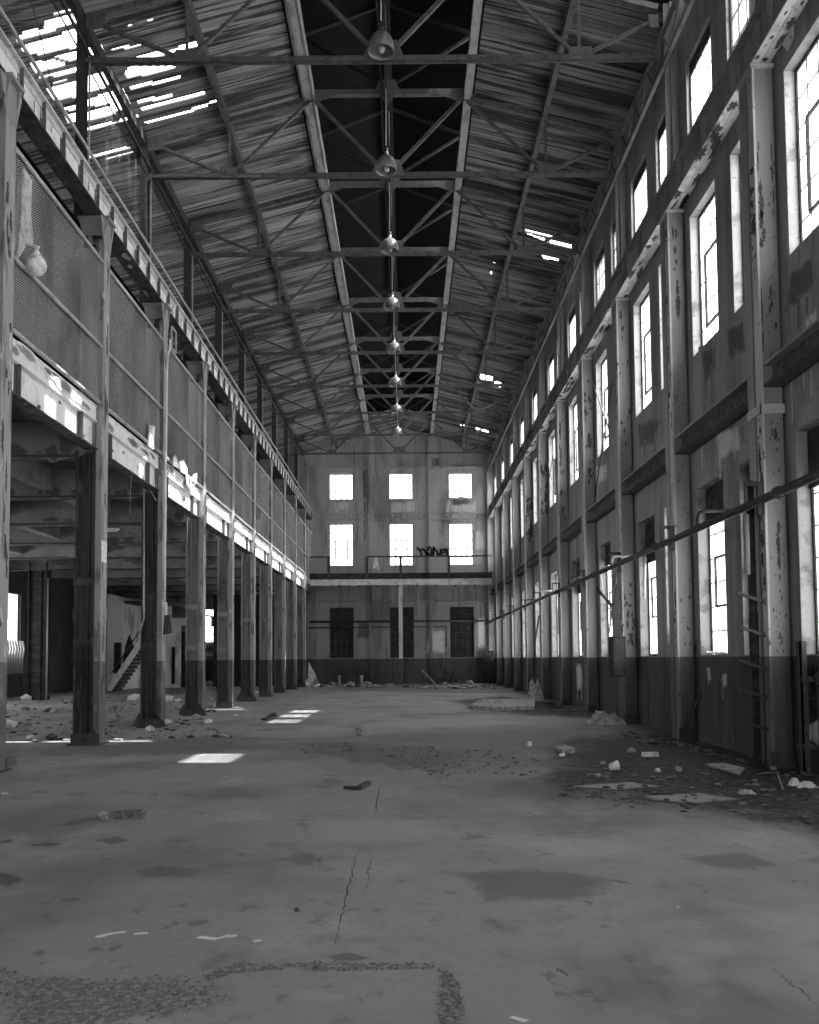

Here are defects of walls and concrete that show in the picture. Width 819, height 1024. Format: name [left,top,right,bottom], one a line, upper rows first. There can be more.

peeling [645,101,739,265]
peeling [750,142,775,262]
peeling [761,263,777,356]
peeling [5,323,293,578]
peeling [758,417,781,481]
peeling [760,499,787,653]
crack [319,846,371,943]
leakage [417,863,649,908]